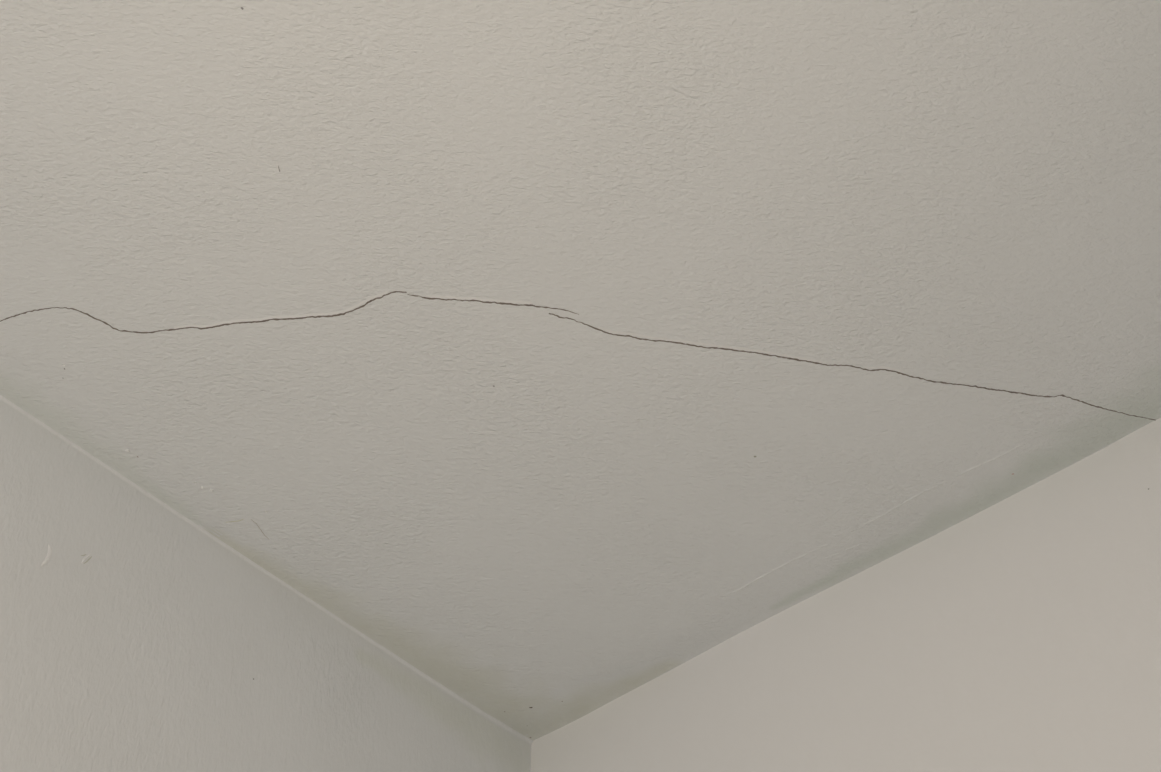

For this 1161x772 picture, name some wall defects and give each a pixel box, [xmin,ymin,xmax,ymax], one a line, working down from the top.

crack [1,290,1155,420]